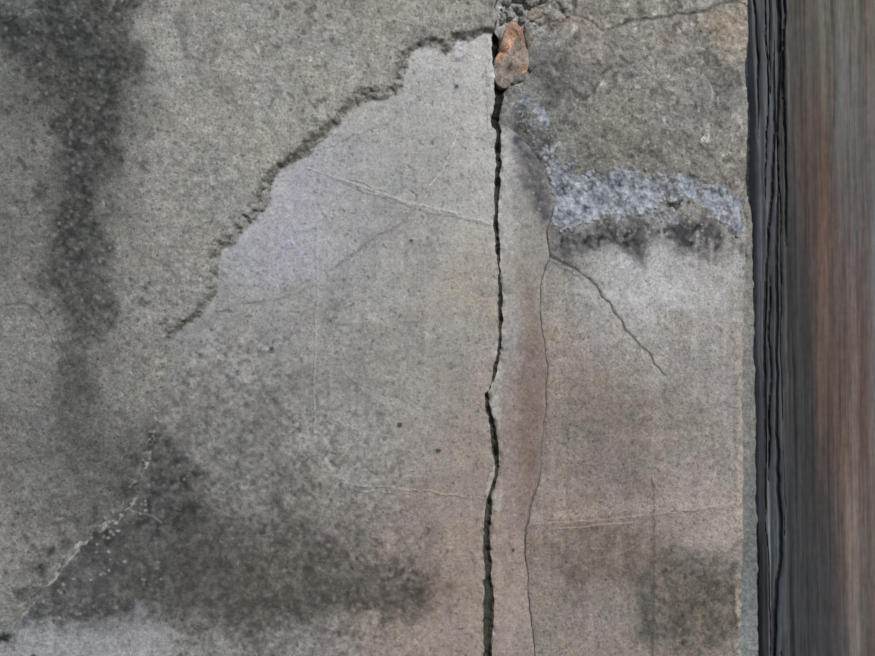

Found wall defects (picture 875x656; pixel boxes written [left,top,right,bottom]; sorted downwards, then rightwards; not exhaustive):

flaking render [159,0,752,346]
leakage [525,34,584,112]
crack [551,0,749,41]
leakage [673,50,748,109]
flaking render [3,338,174,631]
leakage [0,0,480,656]
crack [214,0,505,656]
flaking render [484,466,506,514]
flaking render [489,357,505,432]
crack [524,209,680,656]
leakage [499,97,752,656]
flaking render [733,319,745,555]